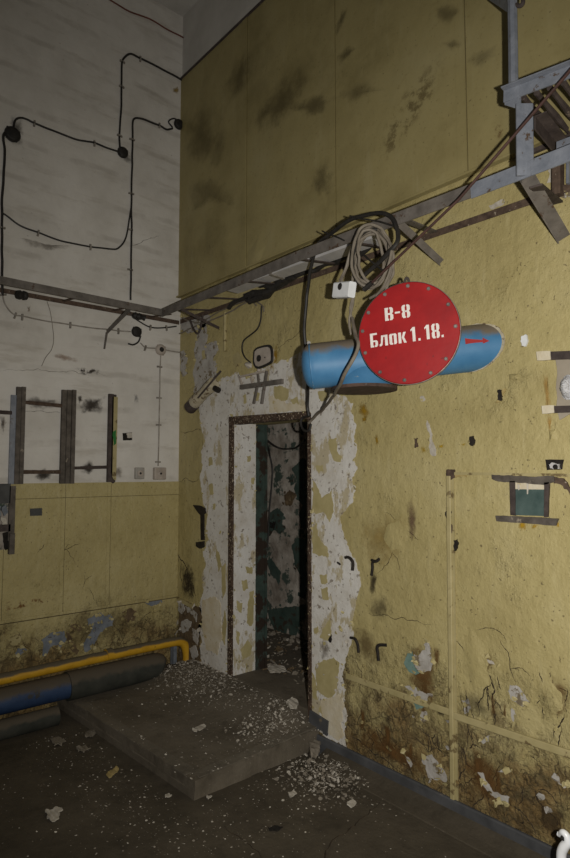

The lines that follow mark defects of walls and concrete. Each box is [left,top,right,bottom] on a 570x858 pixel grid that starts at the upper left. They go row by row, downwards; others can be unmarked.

peeling [175,311,361,759]
peeling [40,600,162,658]
peeling [400,638,449,742]
crack [350,628,568,833]
peeling [486,685,532,728]
peeling [362,745,461,786]
peeling [460,735,513,817]
peeling [523,790,553,814]
peeling [552,773,570,812]